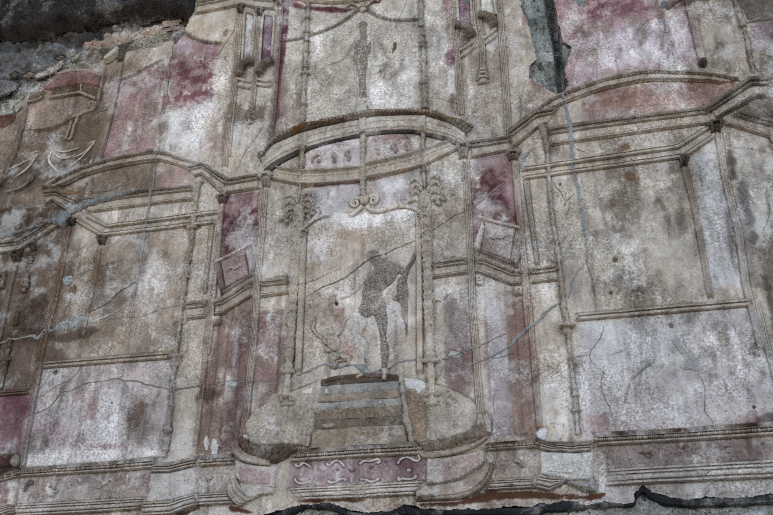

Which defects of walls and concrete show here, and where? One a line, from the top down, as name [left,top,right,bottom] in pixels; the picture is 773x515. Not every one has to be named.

flaking render [0,114,15,128]
crack [0,152,178,352]
crack [442,92,595,367]
crack [0,374,276,432]
crack [297,358,416,377]
crack [554,326,621,427]